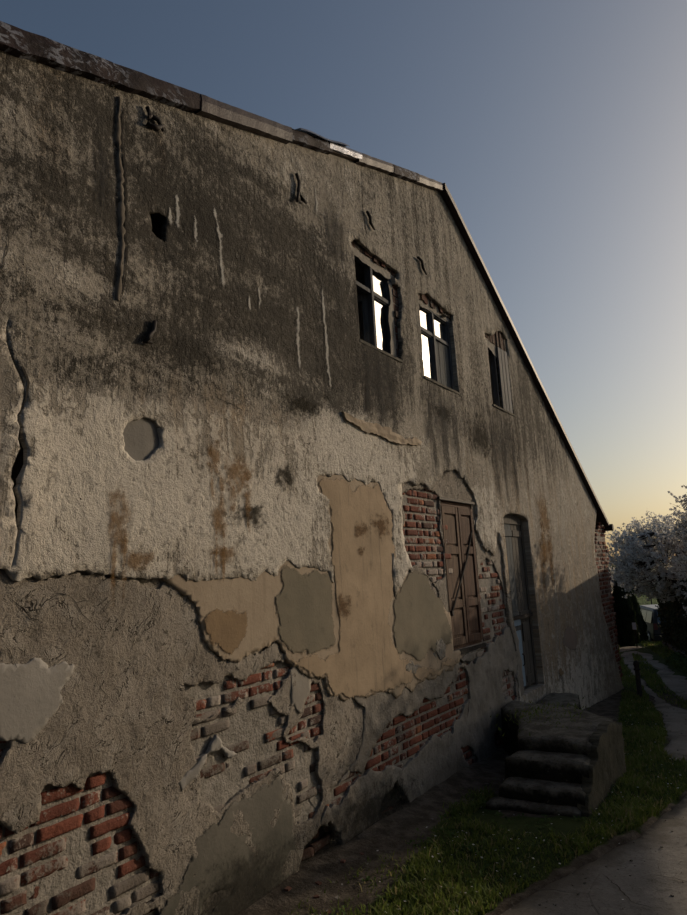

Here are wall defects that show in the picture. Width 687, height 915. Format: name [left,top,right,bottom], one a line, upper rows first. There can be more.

crack [0,227,11,315]
spalling [150,214,163,239]
leakage [168,194,181,228]
leakage [213,208,226,287]
leakage [322,289,332,387]
crack [11,365,30,519]
rust [109,493,154,596]
rust [207,441,251,580]
spalling [0,470,508,915]